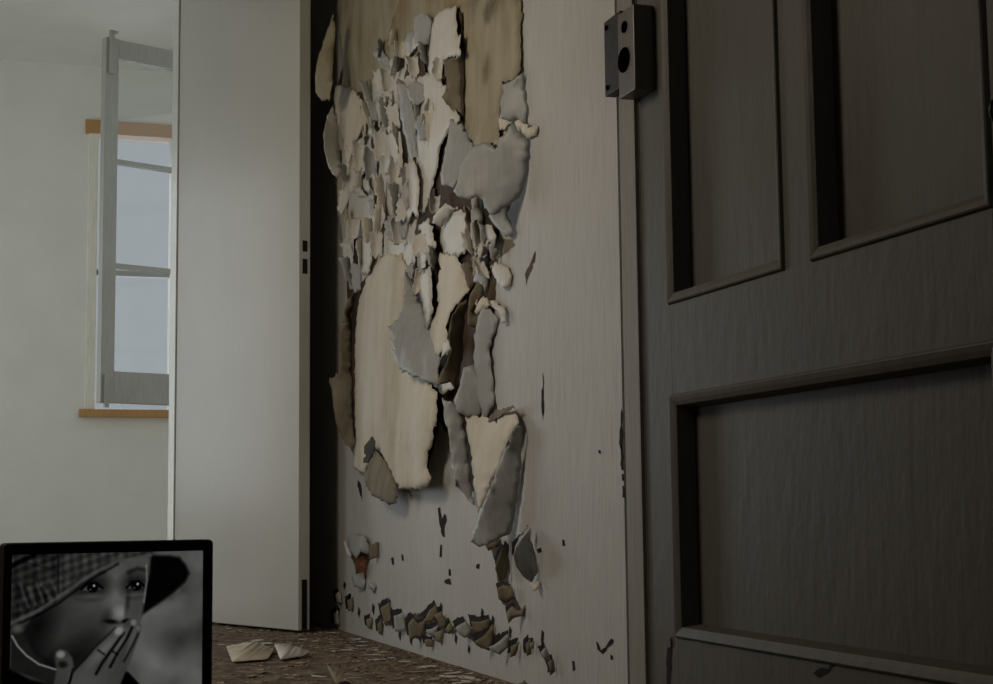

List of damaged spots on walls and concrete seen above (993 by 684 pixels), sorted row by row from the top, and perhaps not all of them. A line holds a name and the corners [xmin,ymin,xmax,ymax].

peeling [315,0,555,675]